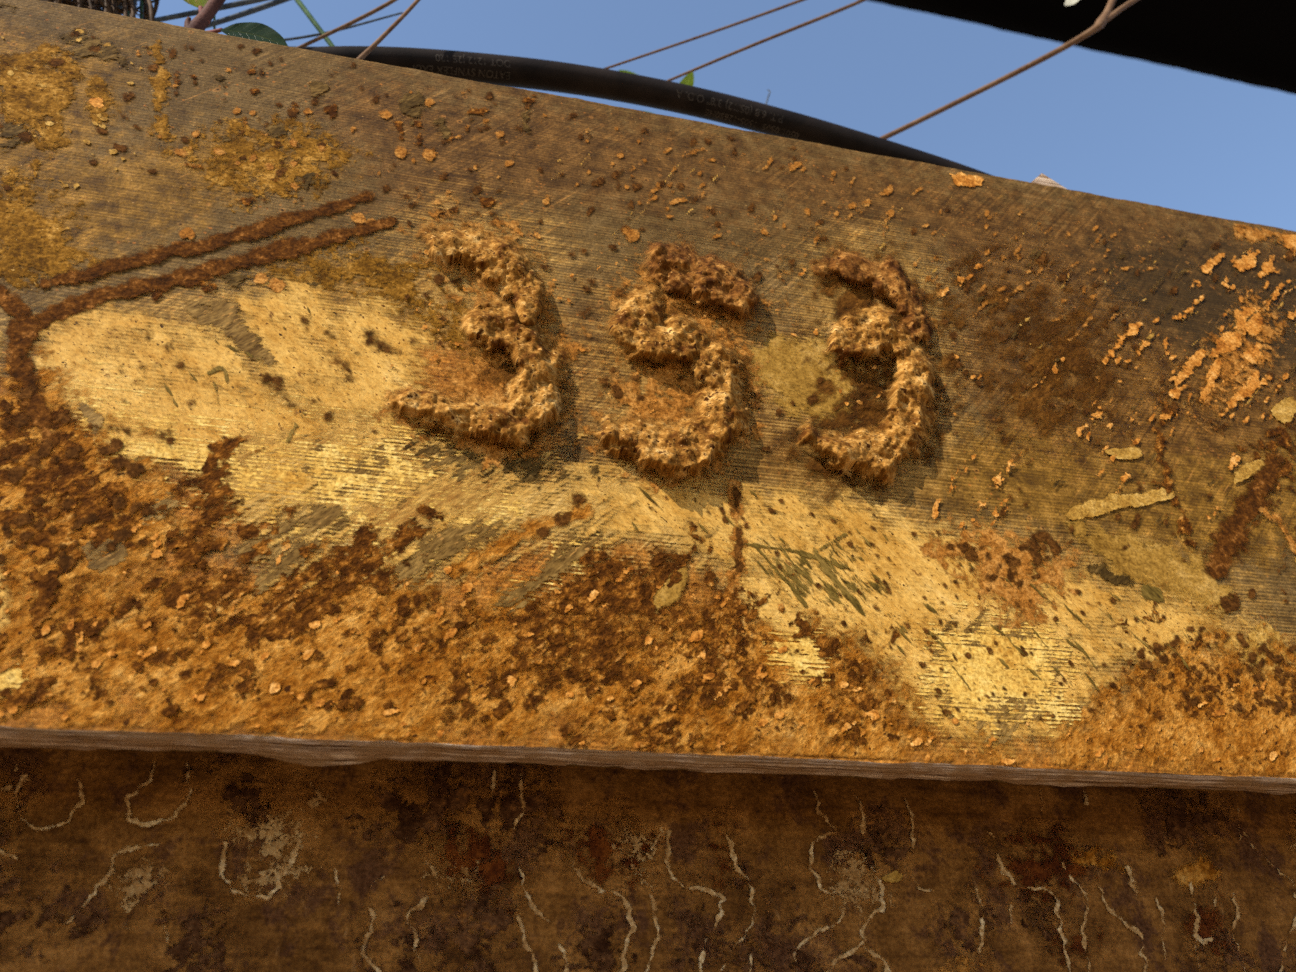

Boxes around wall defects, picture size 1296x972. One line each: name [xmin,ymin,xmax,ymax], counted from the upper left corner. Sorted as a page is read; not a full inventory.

rust [1,58,74,88]
rust [70,28,111,53]
rust [83,45,203,174]
rust [0,82,1296,775]